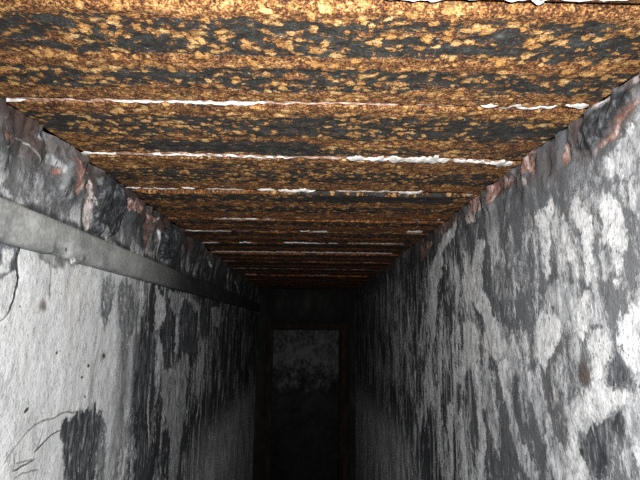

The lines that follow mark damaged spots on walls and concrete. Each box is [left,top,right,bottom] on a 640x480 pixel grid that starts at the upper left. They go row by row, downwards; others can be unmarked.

leakage [6,97,399,106]
leakage [81,151,514,167]
crack [0,248,20,321]
leakage [101,276,137,369]
leakage [133,290,200,480]
crack [5,410,82,478]
leakage [462,370,487,480]